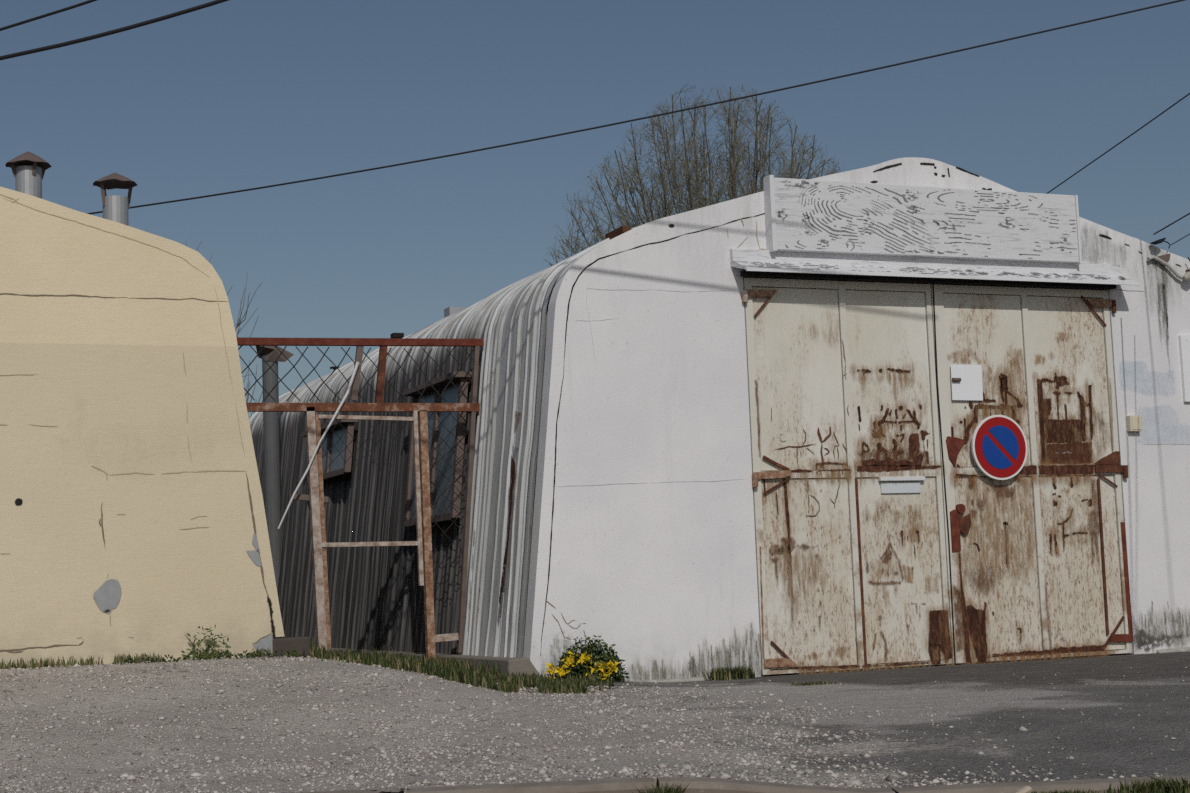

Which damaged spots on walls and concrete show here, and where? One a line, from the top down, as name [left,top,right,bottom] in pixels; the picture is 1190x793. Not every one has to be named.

peeling [785,162,1076,257]
peeling [889,267,1126,280]
damp [1155,263,1169,356]
crack [0,194,269,597]
rust [762,404,941,610]
rust [799,359,1113,674]
spalling [93,579,121,614]
damp [1136,602,1190,650]